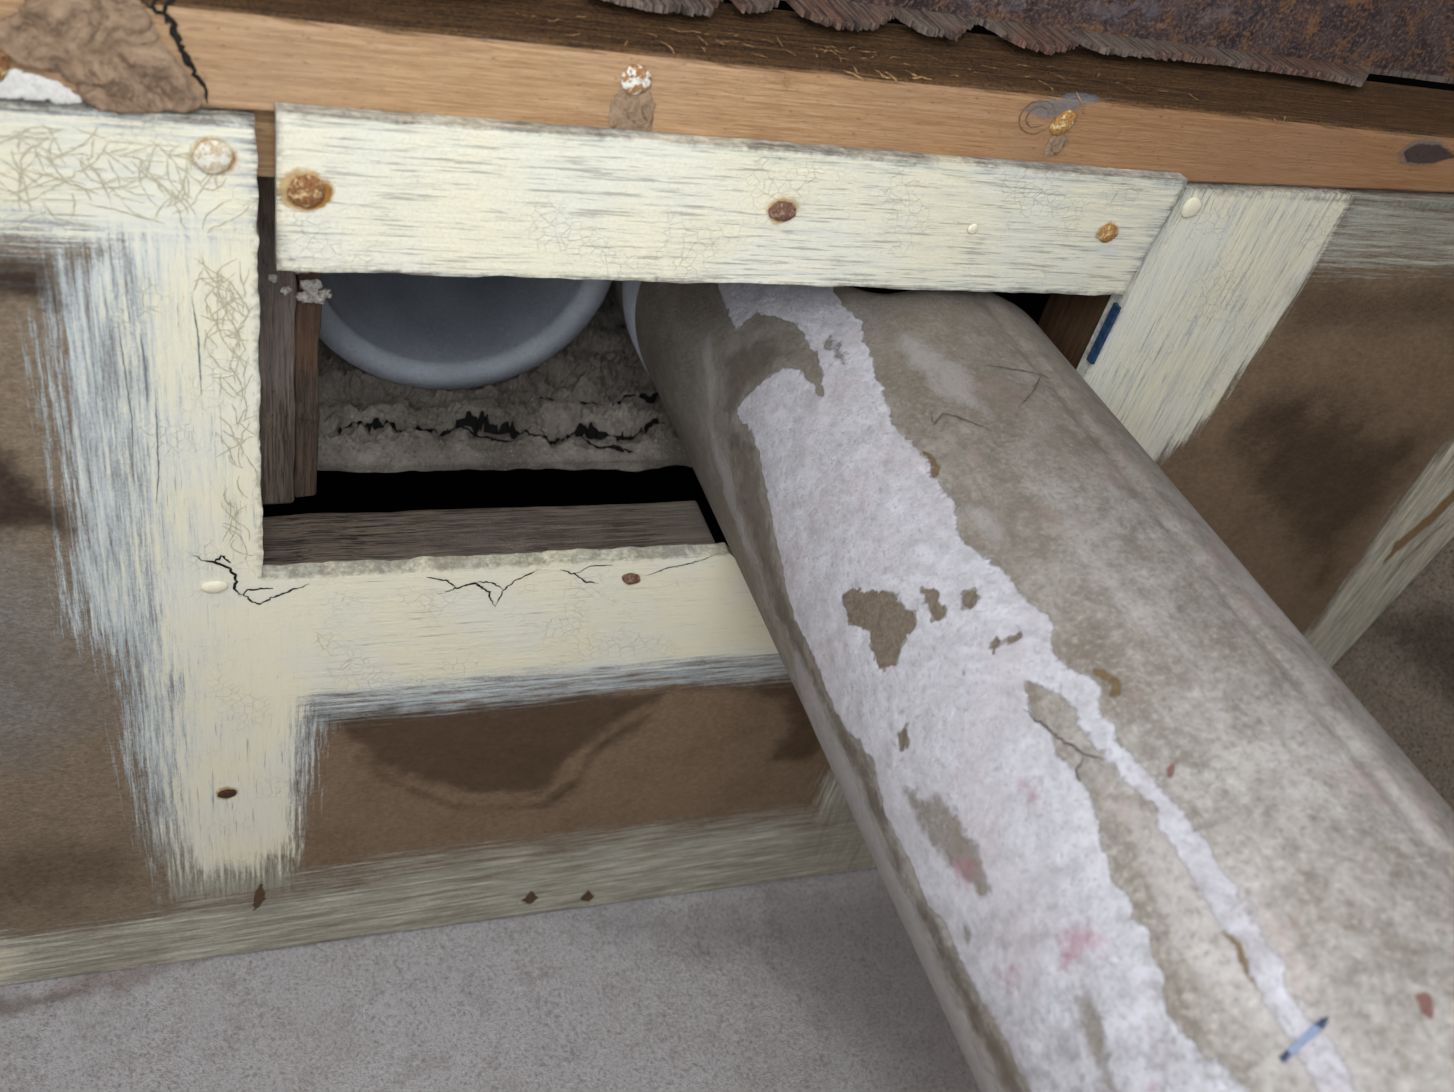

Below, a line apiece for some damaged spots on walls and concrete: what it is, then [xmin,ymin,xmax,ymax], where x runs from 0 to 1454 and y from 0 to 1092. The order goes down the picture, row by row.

crack [140,0,208,104]
peeling [0,68,82,105]
rust [281,170,333,211]
crack [0,123,307,605]
crack [329,392,669,453]
peeling [1384,490,1454,562]
crack [427,565,611,607]
spalling [842,588,945,668]
spalling [963,591,978,609]
leakage [717,283,1355,1092]
spalling [898,729,908,751]
leakage [1416,993,1434,1018]